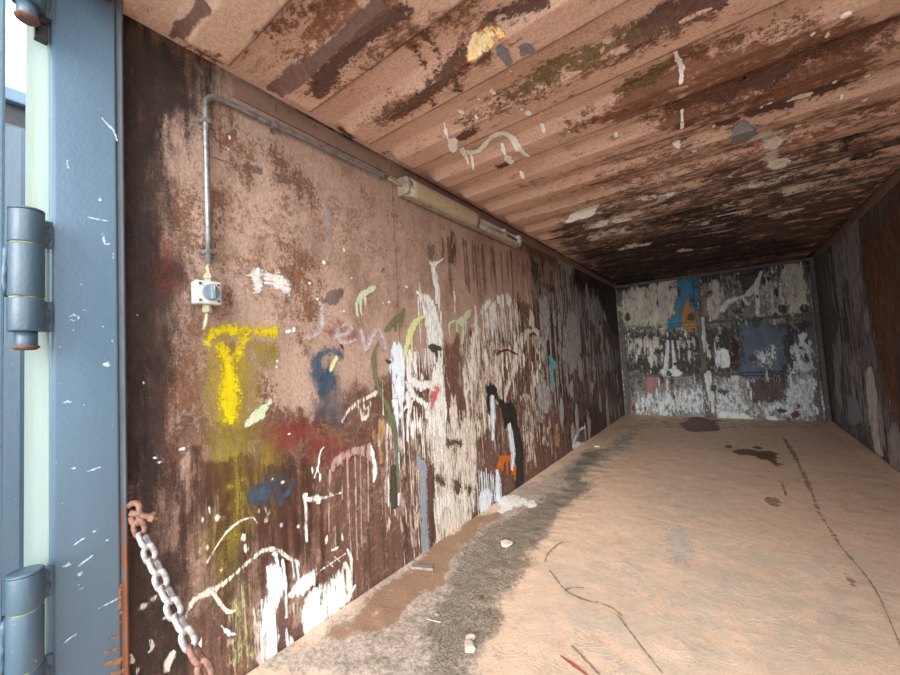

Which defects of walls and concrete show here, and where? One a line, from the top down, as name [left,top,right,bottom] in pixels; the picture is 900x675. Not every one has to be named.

rust [254,0,342,63]
rust [289,0,550,131]
peeling [465,24,535,66]
peeling [734,136,900,190]
peeling [617,279,725,343]
peeling [761,262,813,328]
peeling [633,362,726,417]
peeling [718,410,754,419]
peeling [765,338,825,420]
leakage [478,394,524,508]
leakage [725,445,783,466]
rust [102,584,125,675]